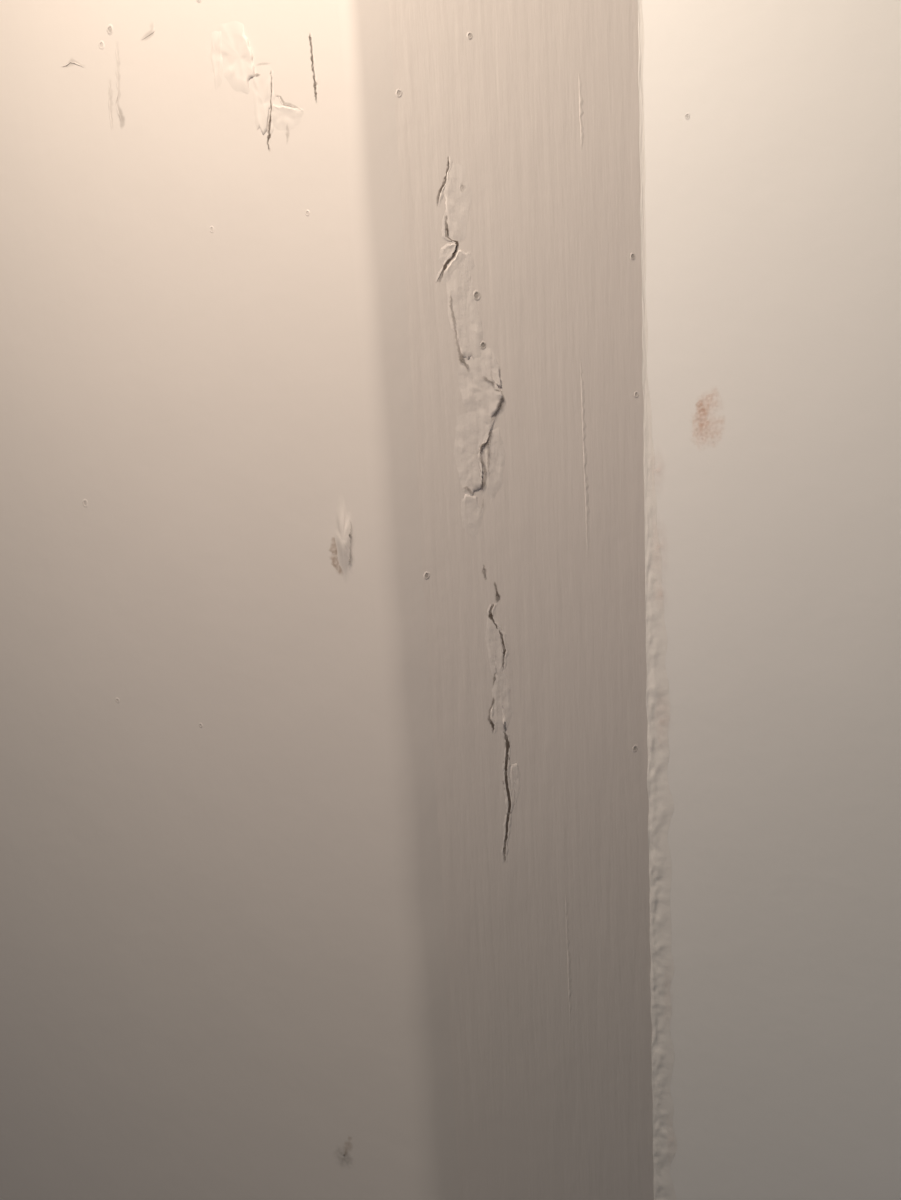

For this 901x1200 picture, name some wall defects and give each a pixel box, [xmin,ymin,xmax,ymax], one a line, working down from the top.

crack [267,32,319,151]
crack [435,156,475,284]
crack [485,588,520,863]